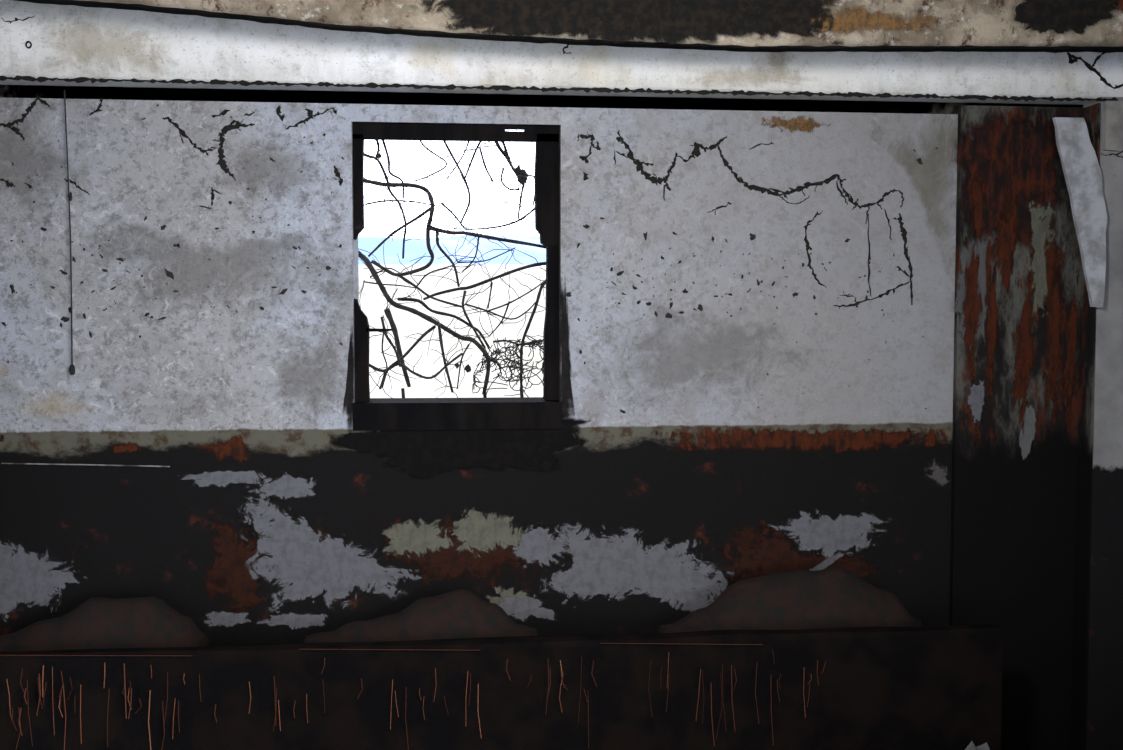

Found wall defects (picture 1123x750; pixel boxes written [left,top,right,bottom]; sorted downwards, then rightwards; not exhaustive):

crack [1067,52,1123,89]
crack [0,97,51,141]
crack [89,98,103,115]
crack [162,106,337,209]
crack [333,166,343,186]
crack [577,130,913,308]
peeling [178,470,734,630]
peeling [771,510,888,571]
peeling [0,541,87,622]